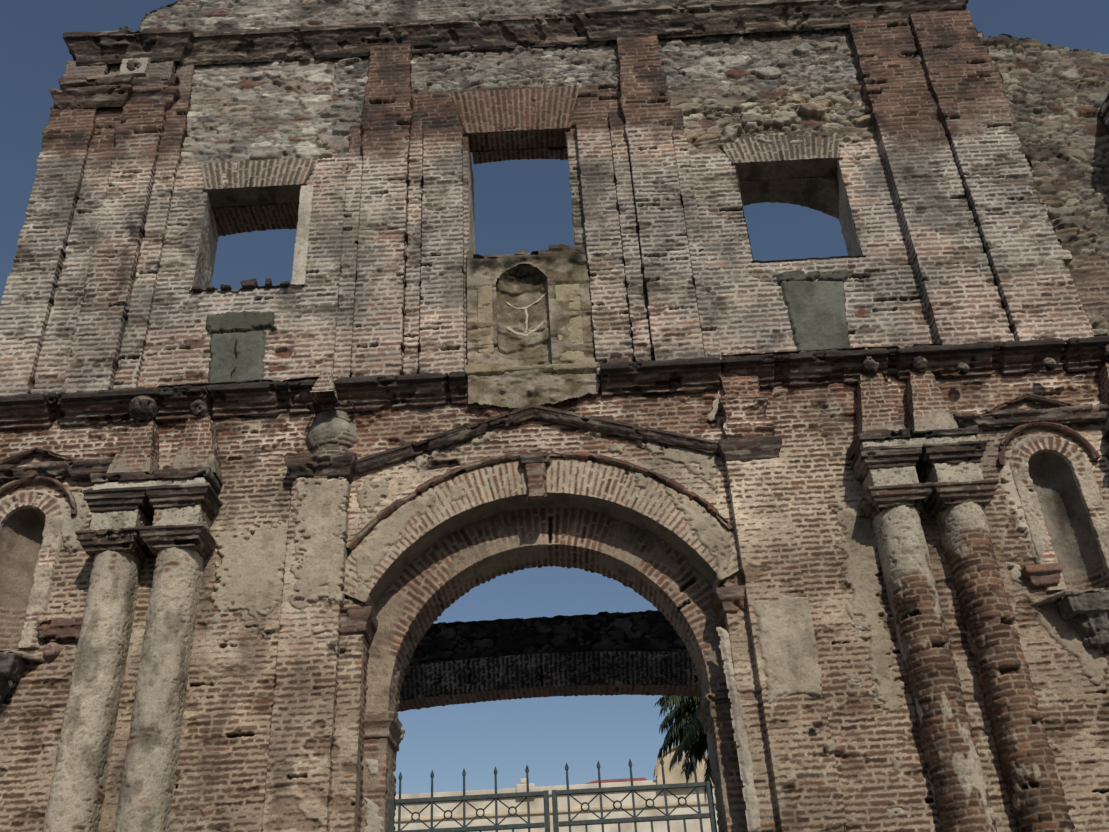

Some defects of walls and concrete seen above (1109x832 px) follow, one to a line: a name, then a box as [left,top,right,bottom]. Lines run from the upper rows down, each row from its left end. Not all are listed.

crack [231,339,239,377]
peeling [828,503,906,716]